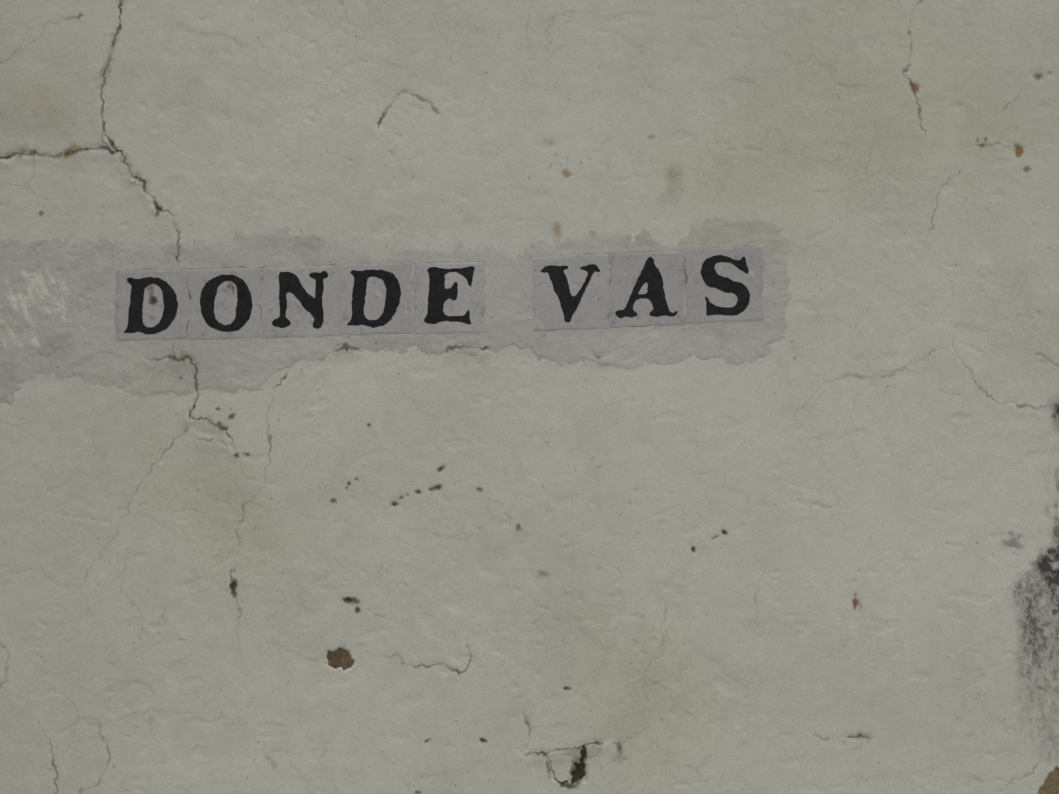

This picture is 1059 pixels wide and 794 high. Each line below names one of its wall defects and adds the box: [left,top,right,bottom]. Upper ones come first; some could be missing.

crack [66,91,162,210]
water stain [1020,528,1059,663]
spalling [550,745,602,784]
spalling [1038,768,1059,794]